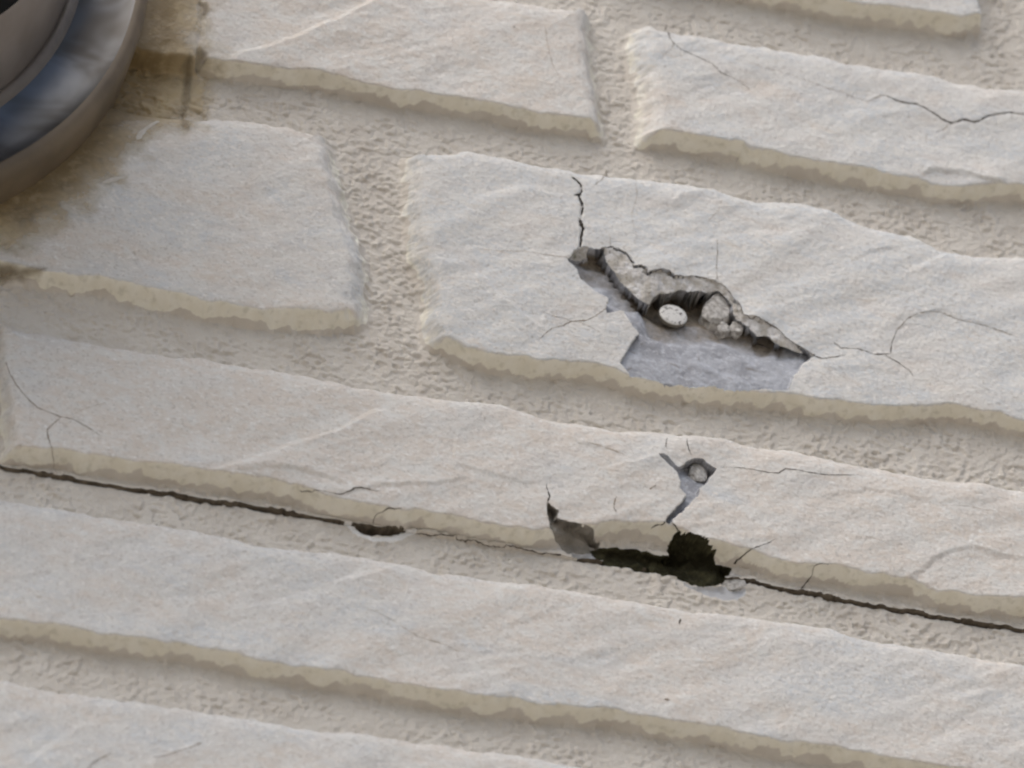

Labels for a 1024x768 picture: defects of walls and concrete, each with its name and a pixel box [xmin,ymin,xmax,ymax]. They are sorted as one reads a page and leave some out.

crack [663,24,1024,137]
crack [484,166,607,259]
spalling [568,246,815,392]
crack [815,311,1011,376]
crack [6,363,103,474]
crack [300,487,402,524]
spalling [547,453,746,601]
crack [737,467,849,475]